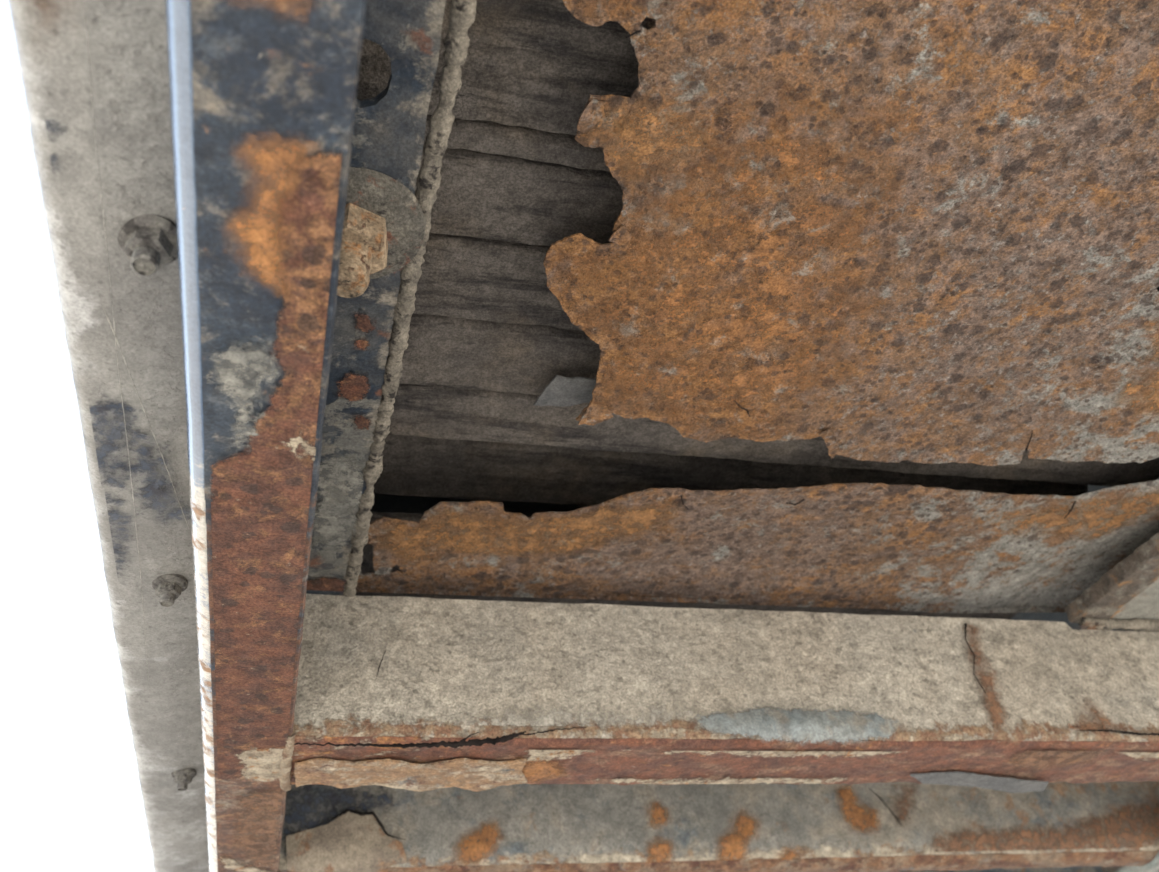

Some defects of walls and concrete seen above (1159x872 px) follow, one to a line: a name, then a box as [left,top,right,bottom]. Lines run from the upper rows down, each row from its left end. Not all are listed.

peeling [577,99,606,133]
peeling [609,224,631,247]
peeling [578,401,613,425]
rust [210,138,346,779]
rust [379,505,676,561]
rust [996,492,1159,541]
crack [294,727,586,748]
peeling [235,746,527,872]
rust [838,785,878,832]
peeling [219,856,273,872]
rust [457,824,503,866]
rust [719,812,756,861]